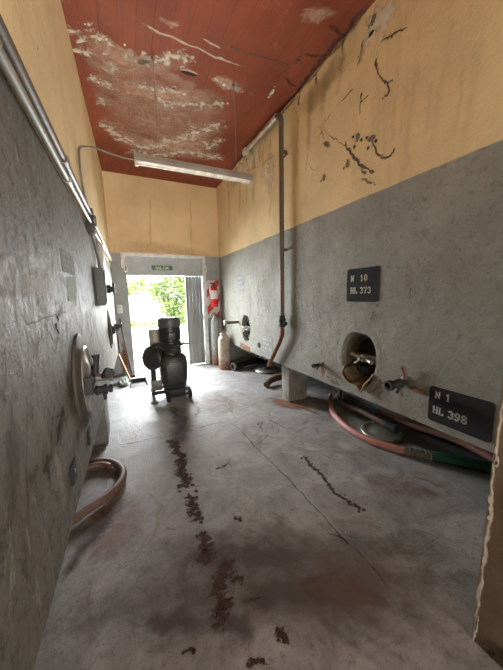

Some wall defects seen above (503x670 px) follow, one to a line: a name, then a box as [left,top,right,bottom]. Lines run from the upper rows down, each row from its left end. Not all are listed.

peeling [213,76,243,92]
crack [342,27,407,114]
peeling [360,0,394,63]
crack [320,115,395,185]
crack [175,396,384,582]
peeling [472,404,503,642]